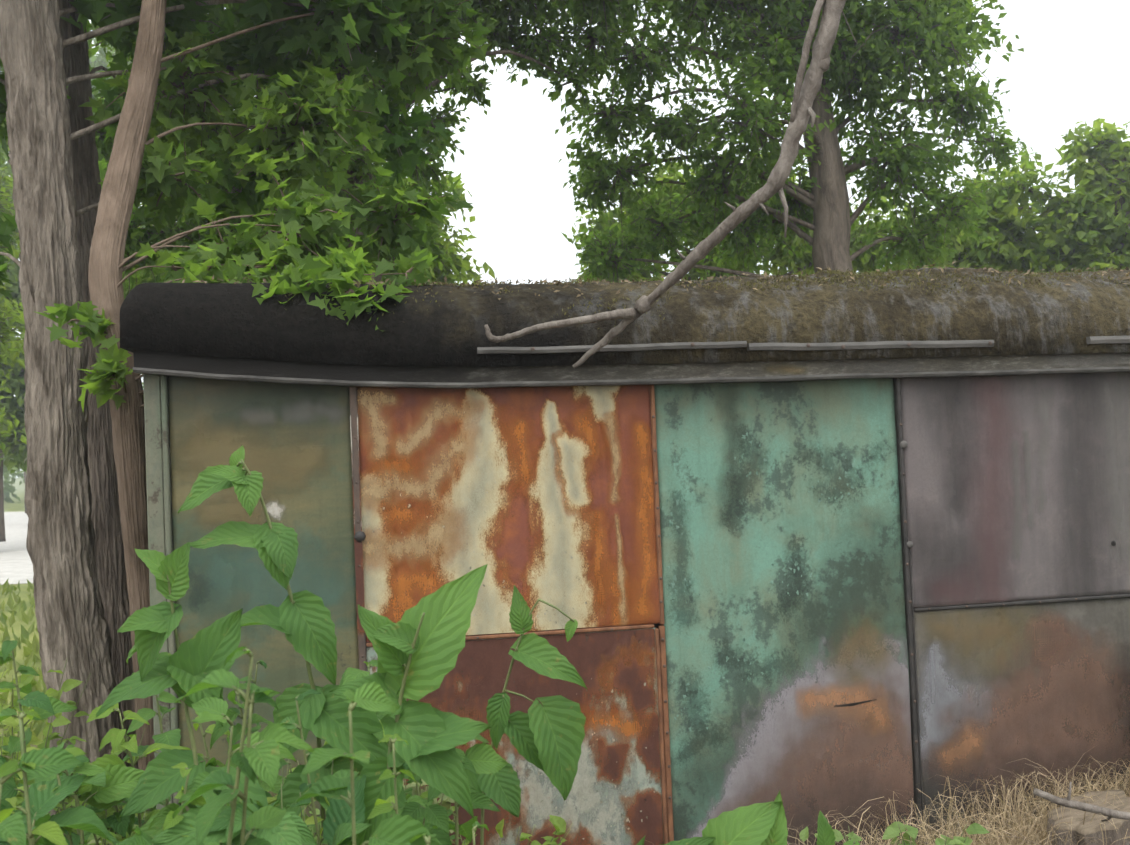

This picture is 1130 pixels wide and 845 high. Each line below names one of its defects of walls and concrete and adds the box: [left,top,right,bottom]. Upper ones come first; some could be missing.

corrosion [387,563,443,623]
corrosion [403,412,663,845]
corrosion [750,687,915,845]
corrosion [930,638,1130,816]